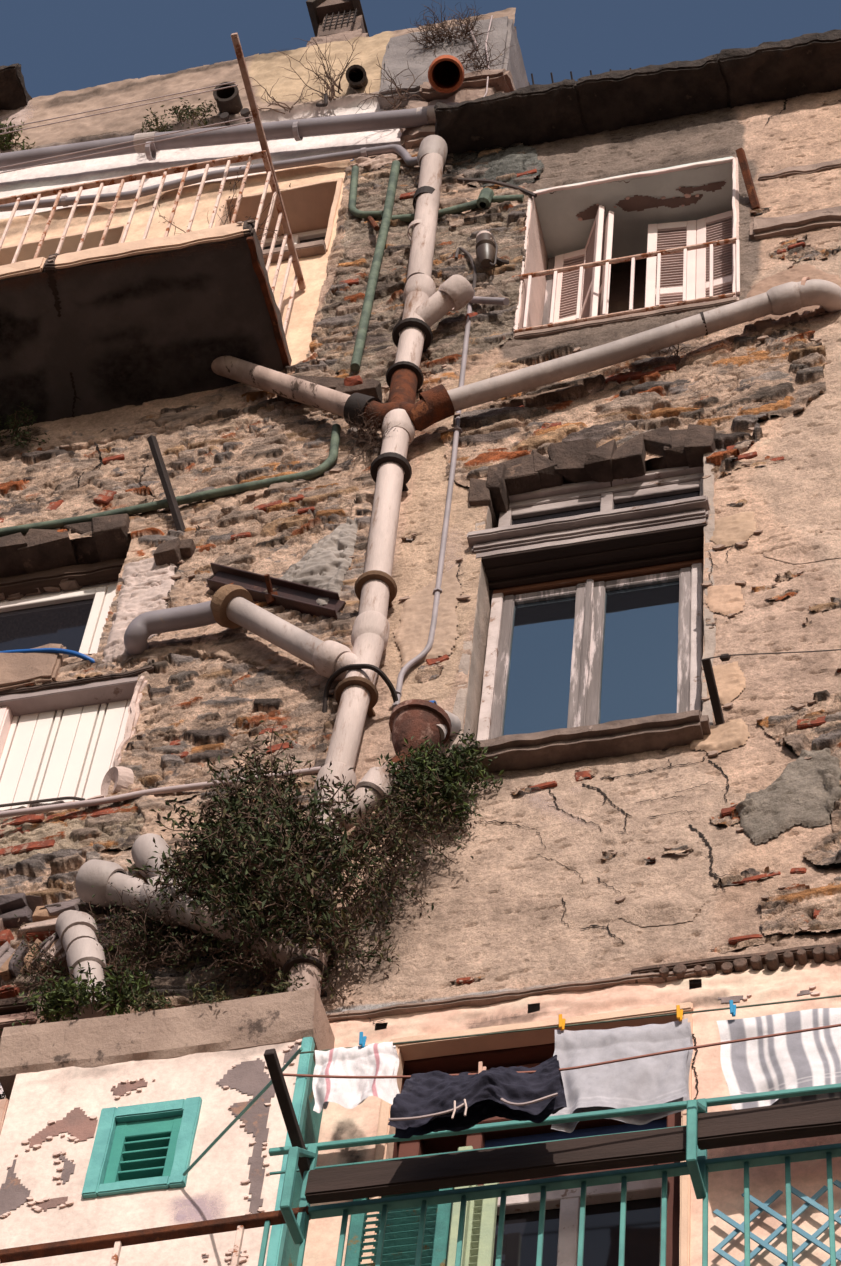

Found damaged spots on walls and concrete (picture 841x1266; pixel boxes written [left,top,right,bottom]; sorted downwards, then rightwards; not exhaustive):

peeling [576,181,726,221]
spalling [438,310,829,487]
spalling [0,404,365,593]
crack [474,754,731,942]
spalling [708,690,841,953]
peeling [0,1107,98,1218]
peeling [111,1077,156,1099]
peeling [216,1058,275,1215]
peeling [283,1039,302,1065]
peeling [225,1248,249,1264]